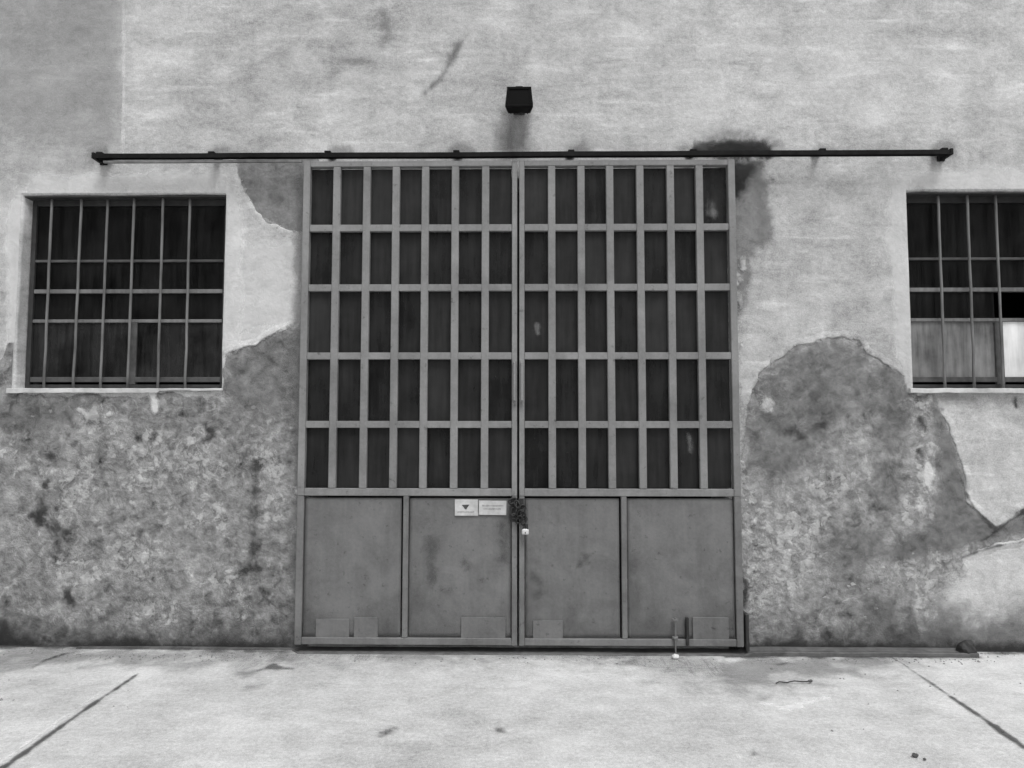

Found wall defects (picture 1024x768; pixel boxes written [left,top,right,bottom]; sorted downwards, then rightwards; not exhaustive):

flaking render [232,159,320,239]
water stain [692,139,771,325]
flaking render [0,320,300,646]
flaking render [726,330,1024,647]